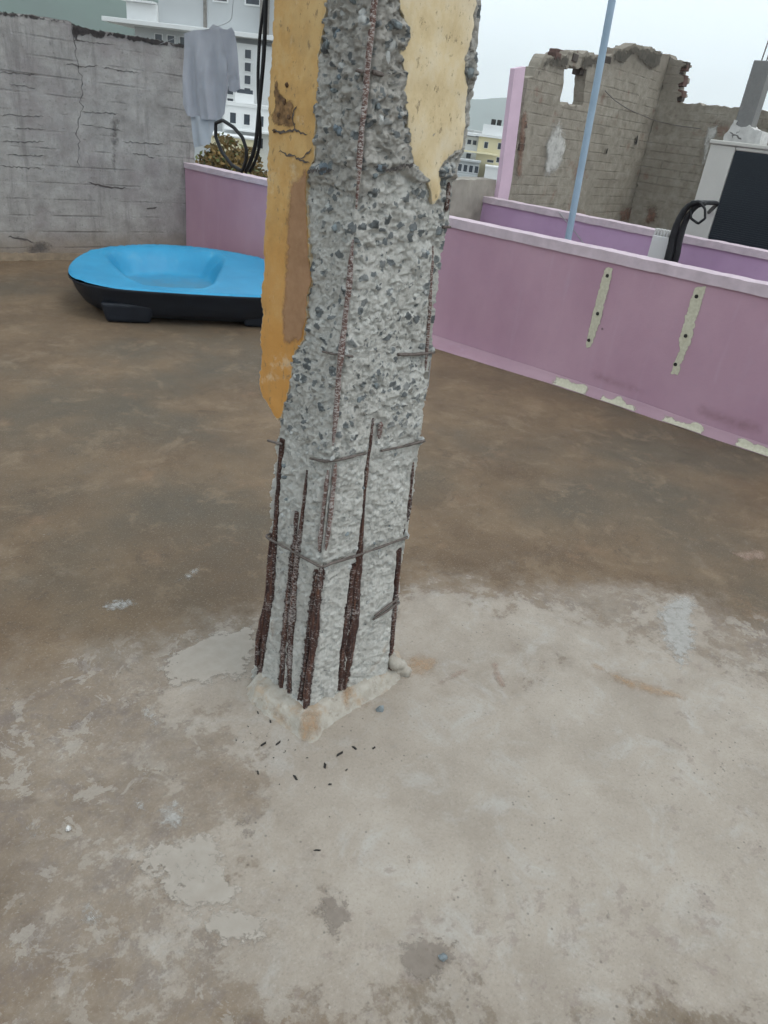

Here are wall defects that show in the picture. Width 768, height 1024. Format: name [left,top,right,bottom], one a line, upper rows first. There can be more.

spalling [548,48,585,75]
spalling [677,61,691,103]
crack [67,23,164,189]
crack [1,114,44,169]
crack [275,106,334,174]
crack [374,163,414,172]
leakage [546,123,565,173]
spalling [158,0,481,706]
peeling [552,377,588,394]
peeling [600,396,636,411]
peeling [662,416,704,434]
peeling [736,438,768,456]